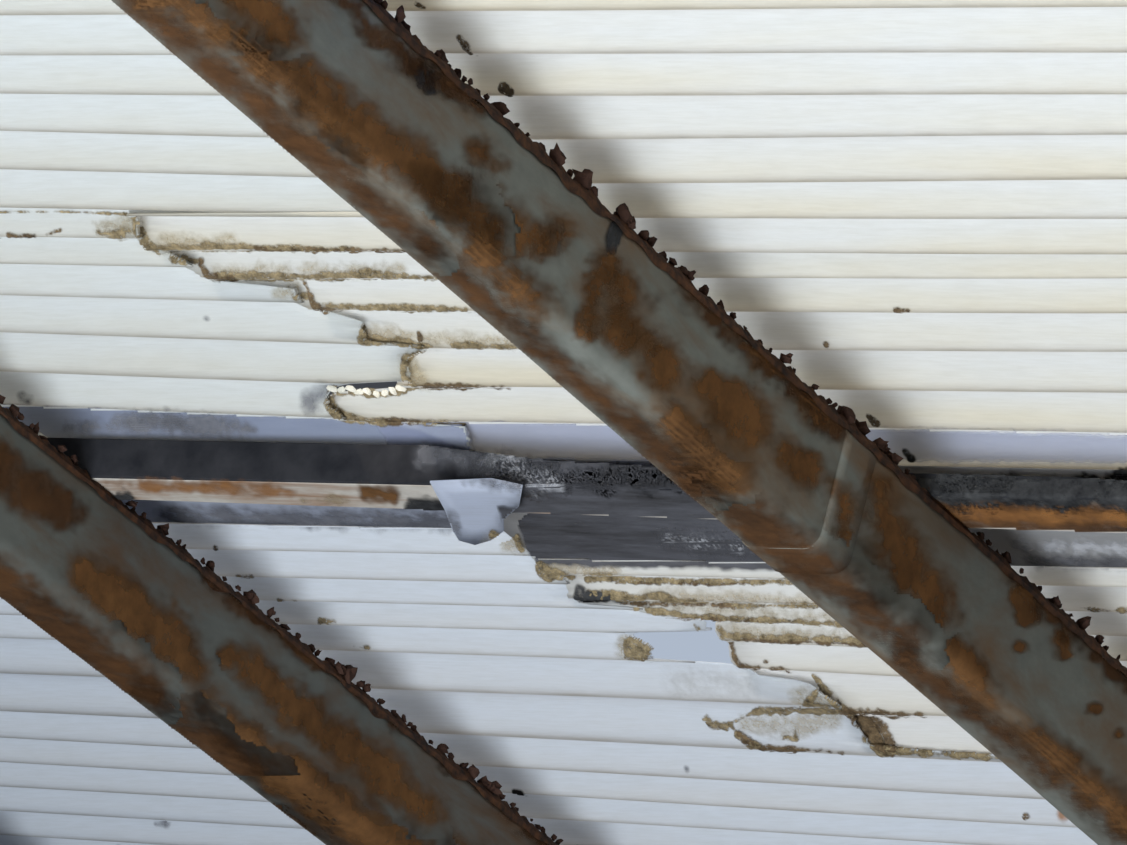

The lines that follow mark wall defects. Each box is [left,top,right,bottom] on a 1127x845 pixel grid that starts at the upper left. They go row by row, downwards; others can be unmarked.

corrosion [0,395,564,845]
corrosion [123,0,772,505]
spalling [618,636,654,662]
corrosion [338,0,1127,788]